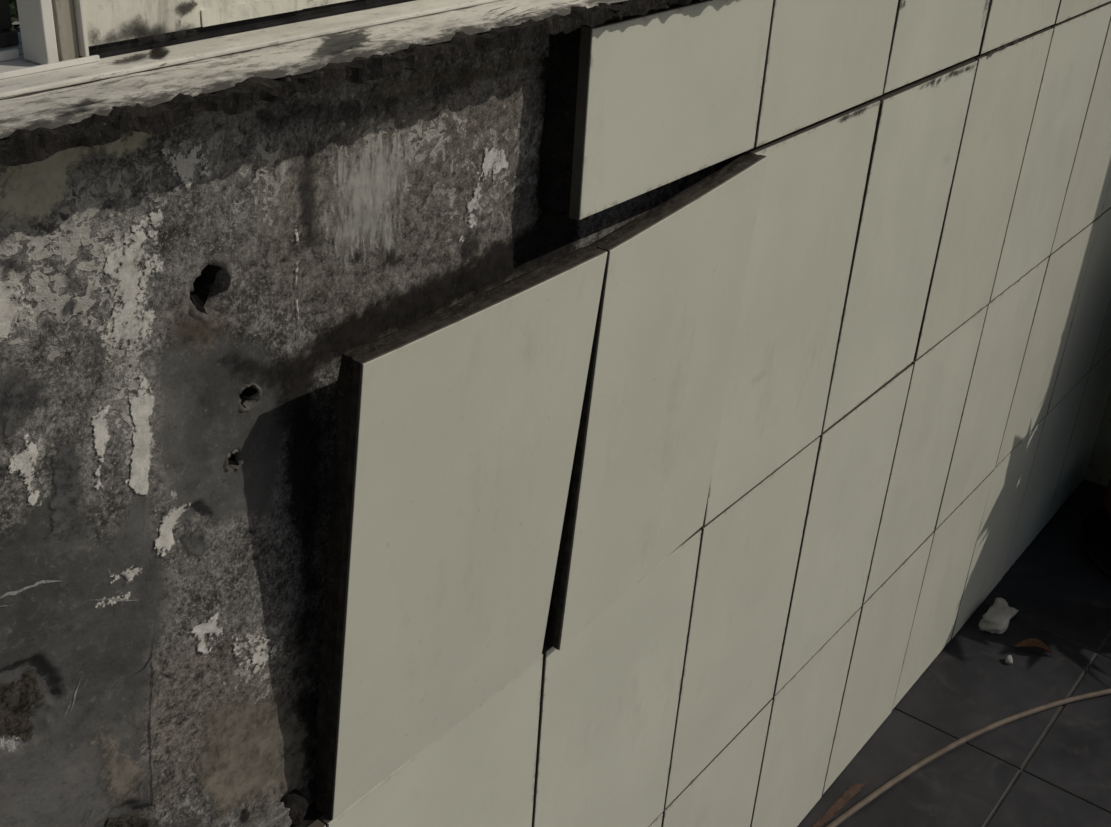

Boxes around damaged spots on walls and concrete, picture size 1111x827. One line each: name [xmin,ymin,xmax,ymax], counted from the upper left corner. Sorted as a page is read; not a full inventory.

flaking render [0,34,549,827]
peeling [305,29,374,58]
water stain [223,56,578,792]
flaking render [435,164,716,314]